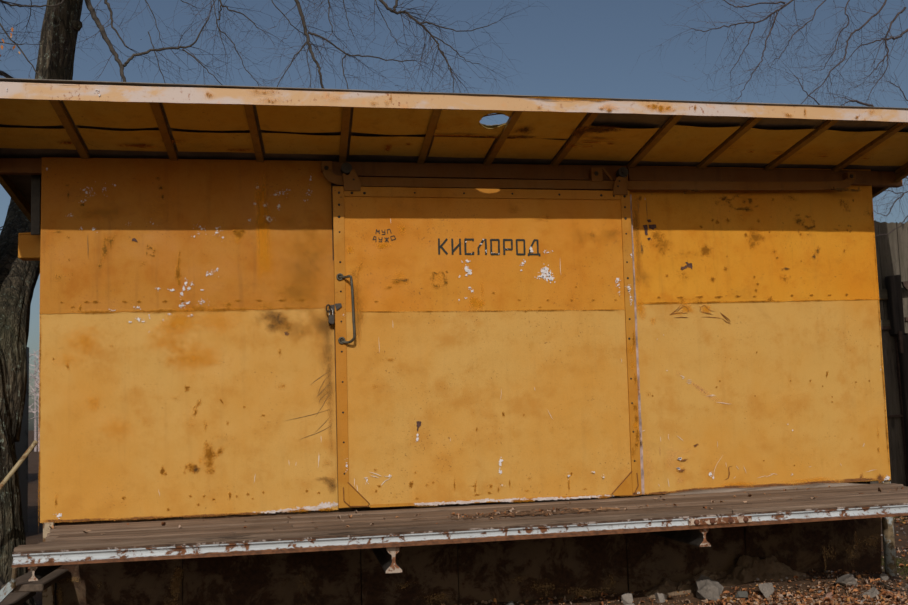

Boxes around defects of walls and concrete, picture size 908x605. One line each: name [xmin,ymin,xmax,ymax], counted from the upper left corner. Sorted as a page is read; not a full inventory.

peeling [537,265,555,283]
peeling [156,278,208,320]
corrosion [185,443,222,473]